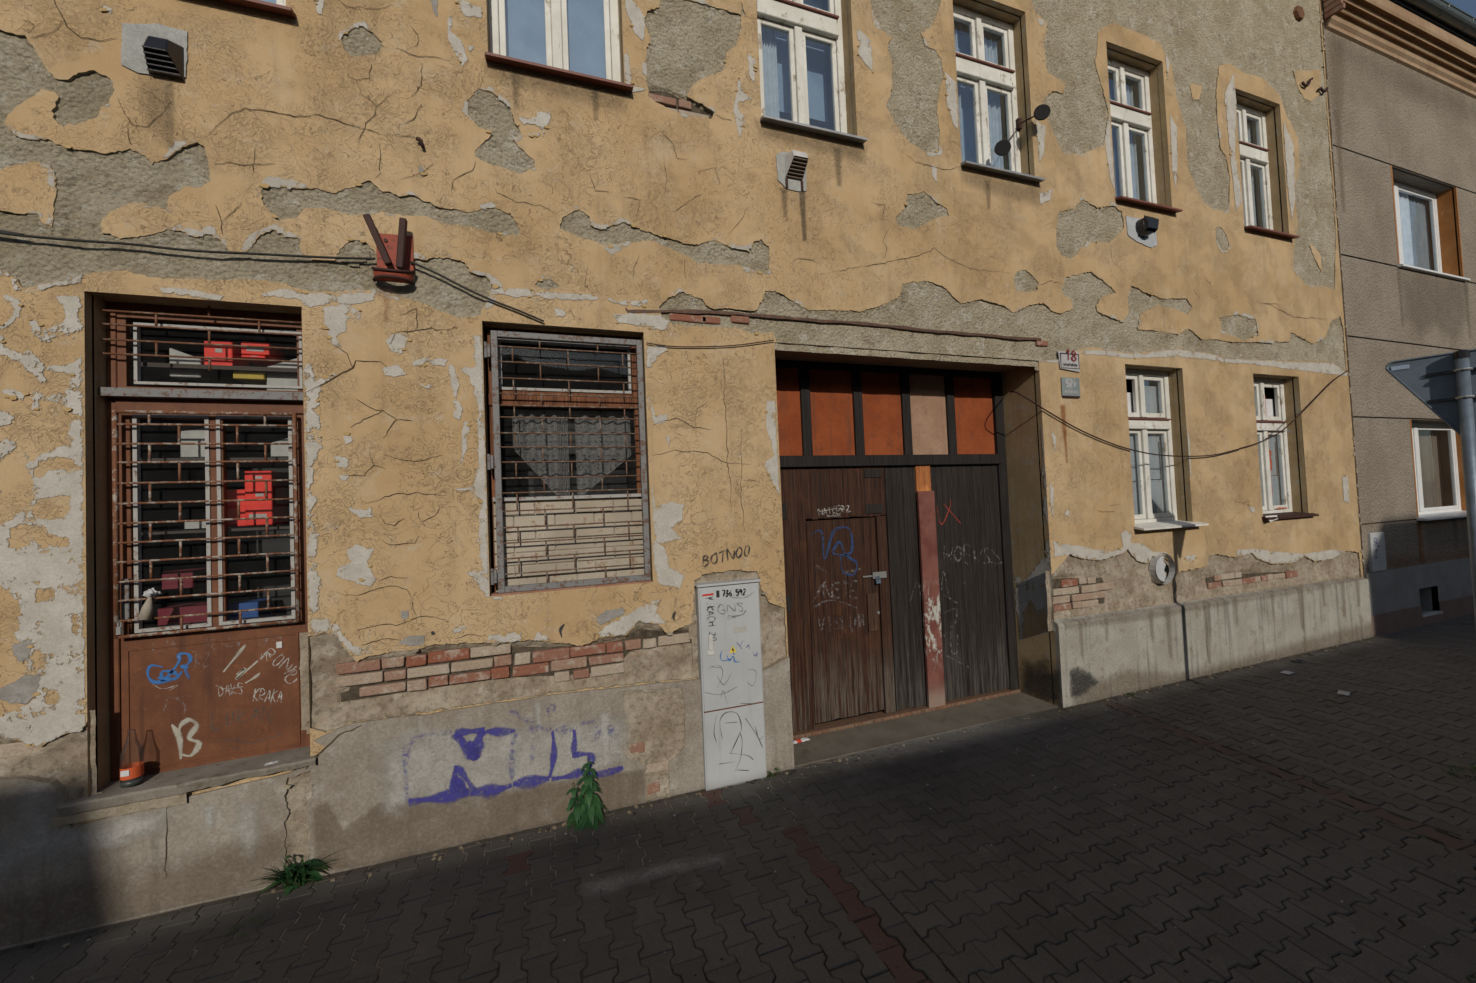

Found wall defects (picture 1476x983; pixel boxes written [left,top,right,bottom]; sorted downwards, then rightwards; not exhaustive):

flaking render [0,0,1362,802]